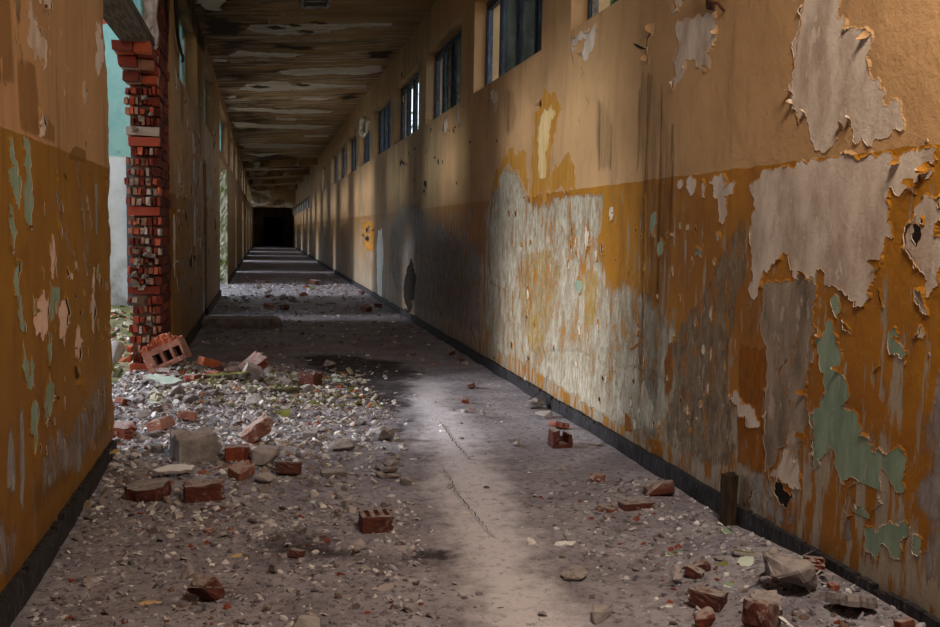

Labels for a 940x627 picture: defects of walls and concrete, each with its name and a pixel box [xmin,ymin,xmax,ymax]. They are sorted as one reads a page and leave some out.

peeling [16,0,53,71]
spalling [94,21,159,86]
peeling [195,0,228,11]
peeling [242,13,394,36]
peeling [570,23,599,62]
peeling [669,0,718,92]
peeling [211,50,385,171]
peeling [172,123,217,280]
peeling [6,105,113,510]
peeling [484,84,716,458]
peeling [677,0,940,583]